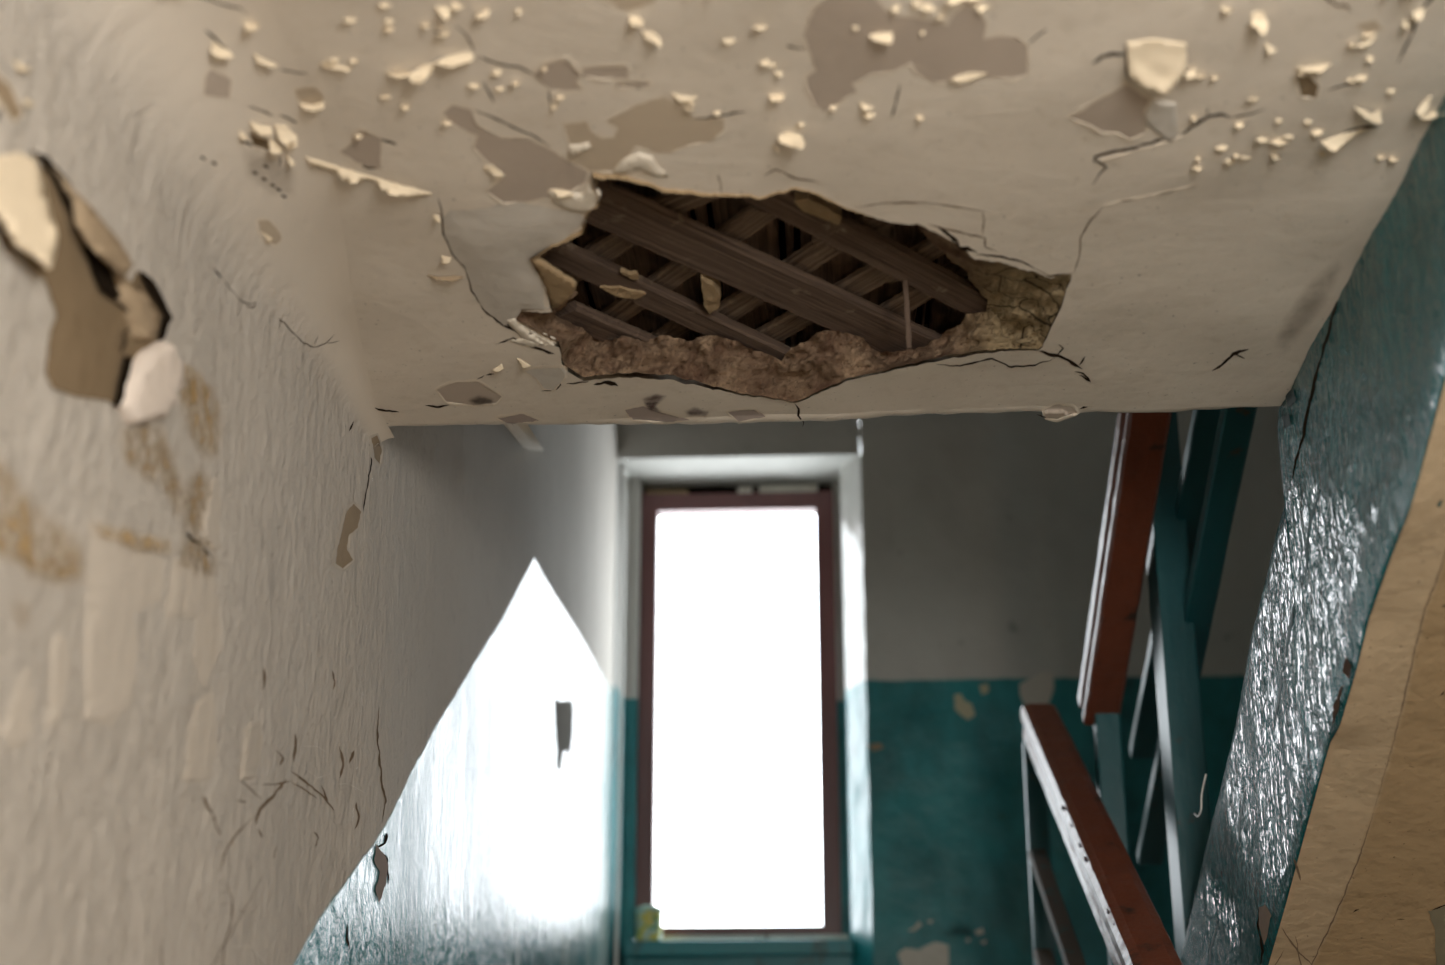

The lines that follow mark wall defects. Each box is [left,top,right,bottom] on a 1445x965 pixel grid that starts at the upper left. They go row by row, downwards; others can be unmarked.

peeling [0,61,34,124]
peeling [202,30,235,99]
flaking render [0,150,208,425]
flaking render [239,0,1071,450]
crack [1291,302,1337,583]
crack [204,733,297,965]
crack [339,710,387,828]
peeling [898,942,949,965]
crack [1311,553,1445,965]
peeling [1428,905,1445,965]